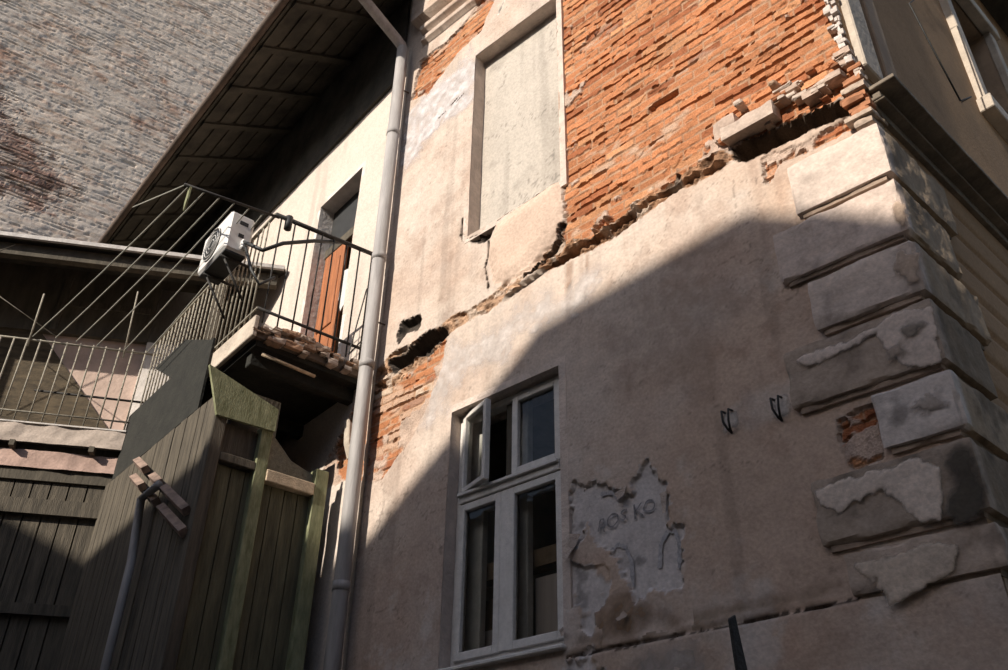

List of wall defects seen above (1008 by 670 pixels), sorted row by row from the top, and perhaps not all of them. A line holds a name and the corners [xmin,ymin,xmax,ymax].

flaking render [410,0,494,101]
flaking render [556,0,856,255]
crack [460,210,512,289]
peeling [796,306,941,367]
flaking render [324,404,355,489]
flaking render [361,314,449,483]
peeling [816,403,943,522]
peeling [562,458,685,670]